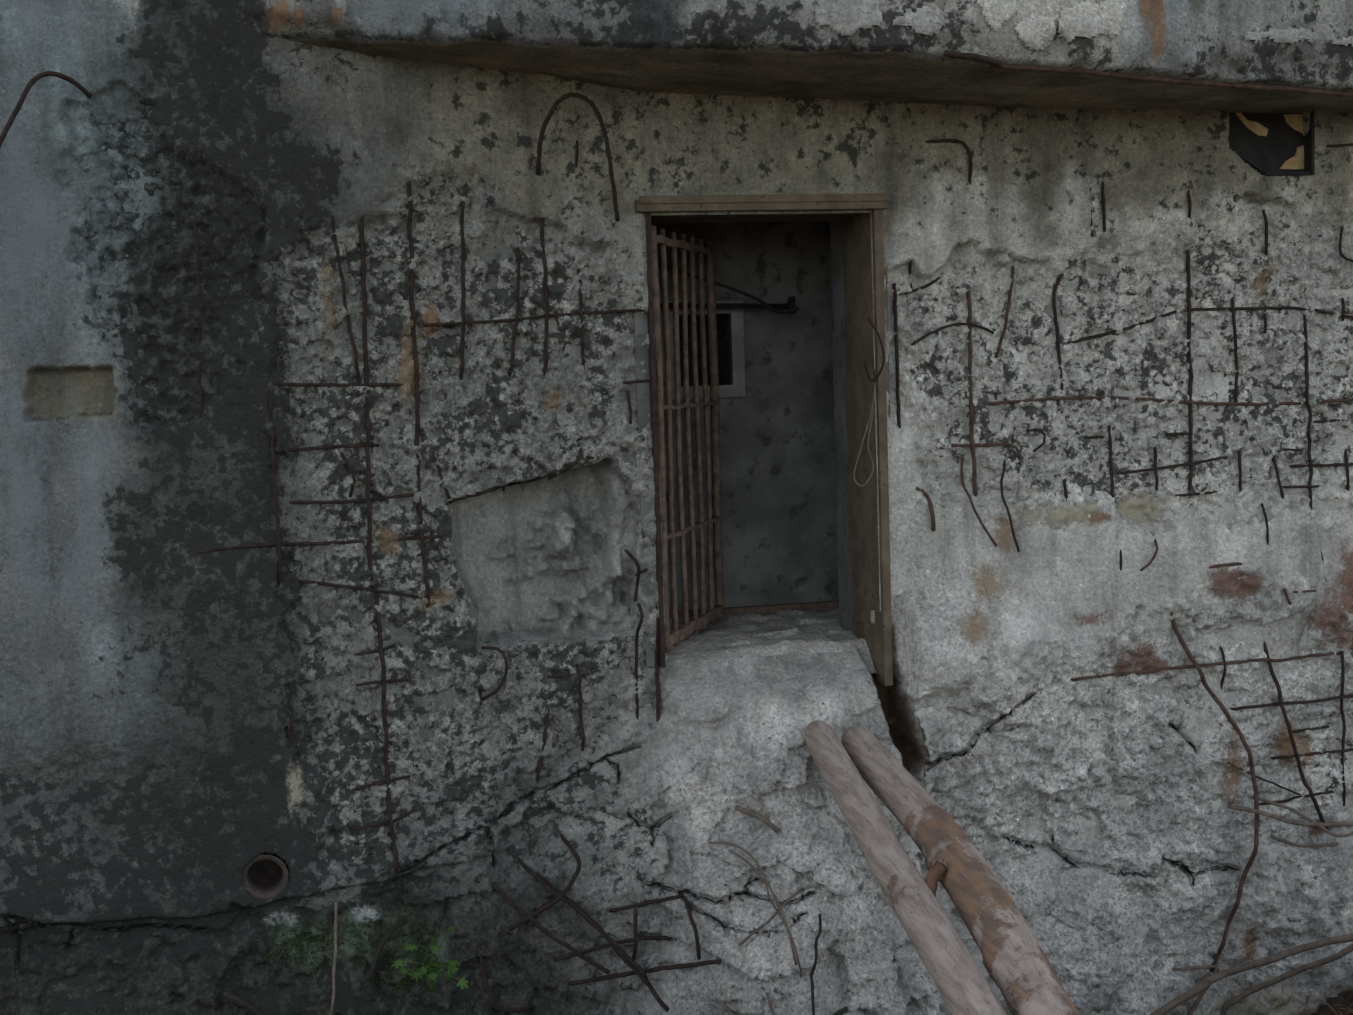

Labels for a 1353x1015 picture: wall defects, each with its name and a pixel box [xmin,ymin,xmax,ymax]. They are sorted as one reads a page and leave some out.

flaking render [812,0,942,36]
flaking render [977,0,1127,51]
flaking render [1244,27,1353,47]
peeling [1235,112,1268,136]
peeling [1280,114,1304,169]
spalling [887,181,1353,572]
spalling [0,71,722,1015]
crack [927,693,1037,771]
rust [286,769,303,808]
spalling [914,551,1353,1015]
crack [1003,835,1235,886]
crack [4,915,212,966]